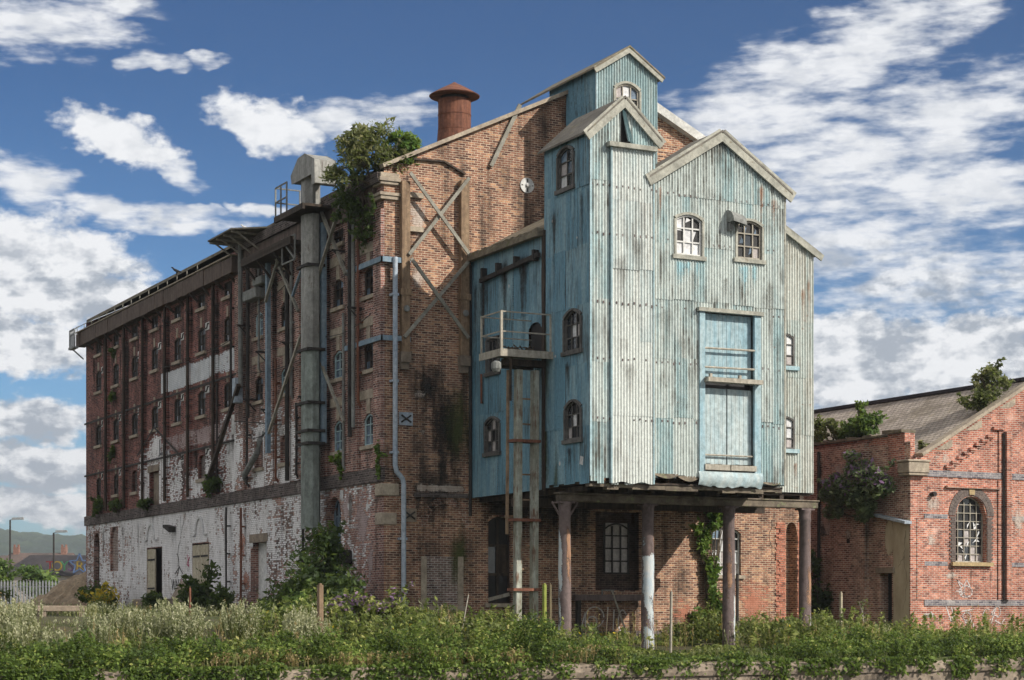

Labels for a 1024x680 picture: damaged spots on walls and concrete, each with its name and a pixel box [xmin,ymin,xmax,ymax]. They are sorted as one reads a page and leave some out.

water stain [410,204,425,234]
peeling [87,404,374,615]
peeling [642,537,654,650]